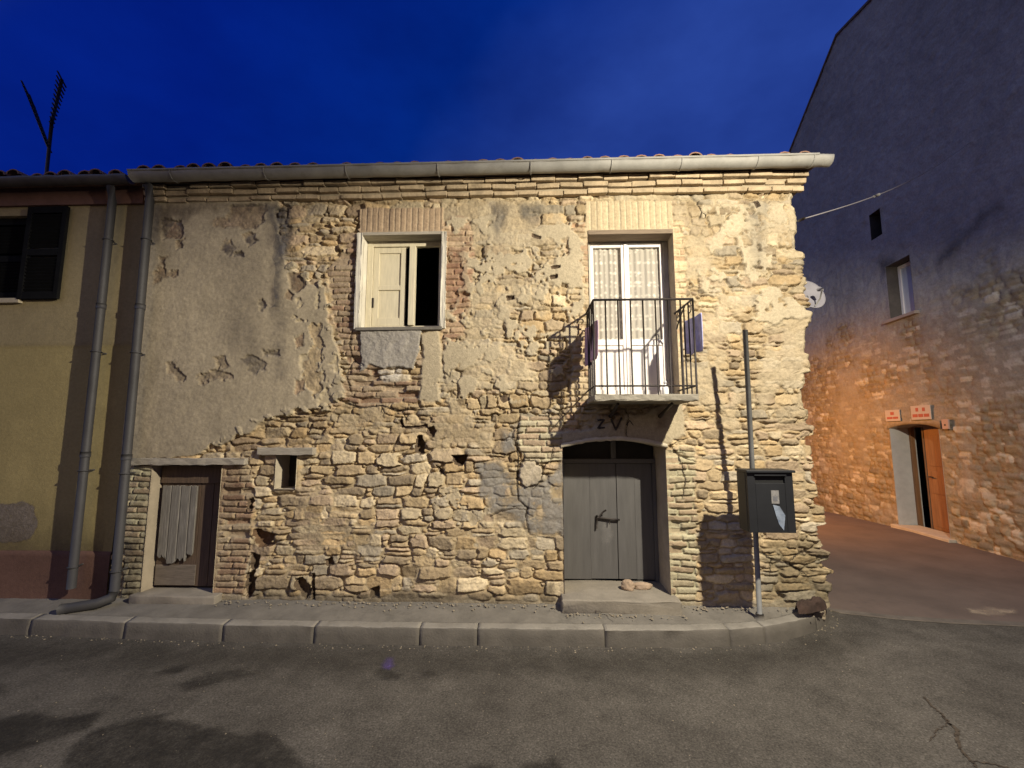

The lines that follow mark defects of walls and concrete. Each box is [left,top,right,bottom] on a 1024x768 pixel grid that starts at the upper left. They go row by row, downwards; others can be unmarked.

spalling [285,261,328,300]
flaking render [212,322,346,446]
spalling [398,417,428,429]
spalling [245,552,260,599]
crack [923,696,1009,768]